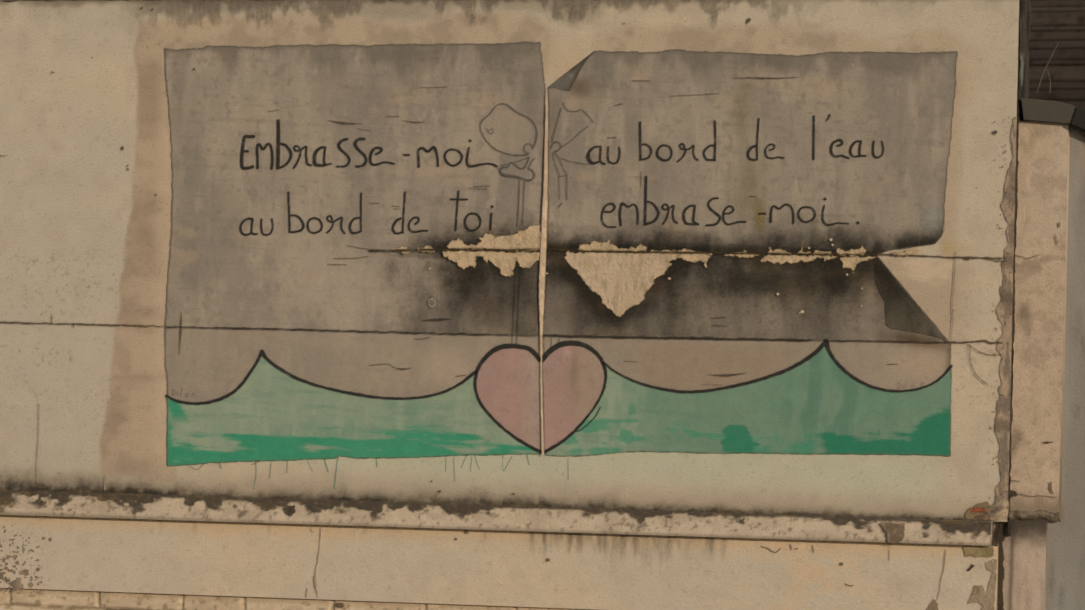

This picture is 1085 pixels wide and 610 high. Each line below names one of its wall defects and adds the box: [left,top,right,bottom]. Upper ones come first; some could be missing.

peeling [390,225,542,277]
peeling [565,240,712,317]
leakage [421,230,941,334]
peeling [725,238,877,275]
peeling [0,526,51,593]
leakage [0,480,994,557]
spalling [967,559,997,610]
leakage [1005,519,1048,534]